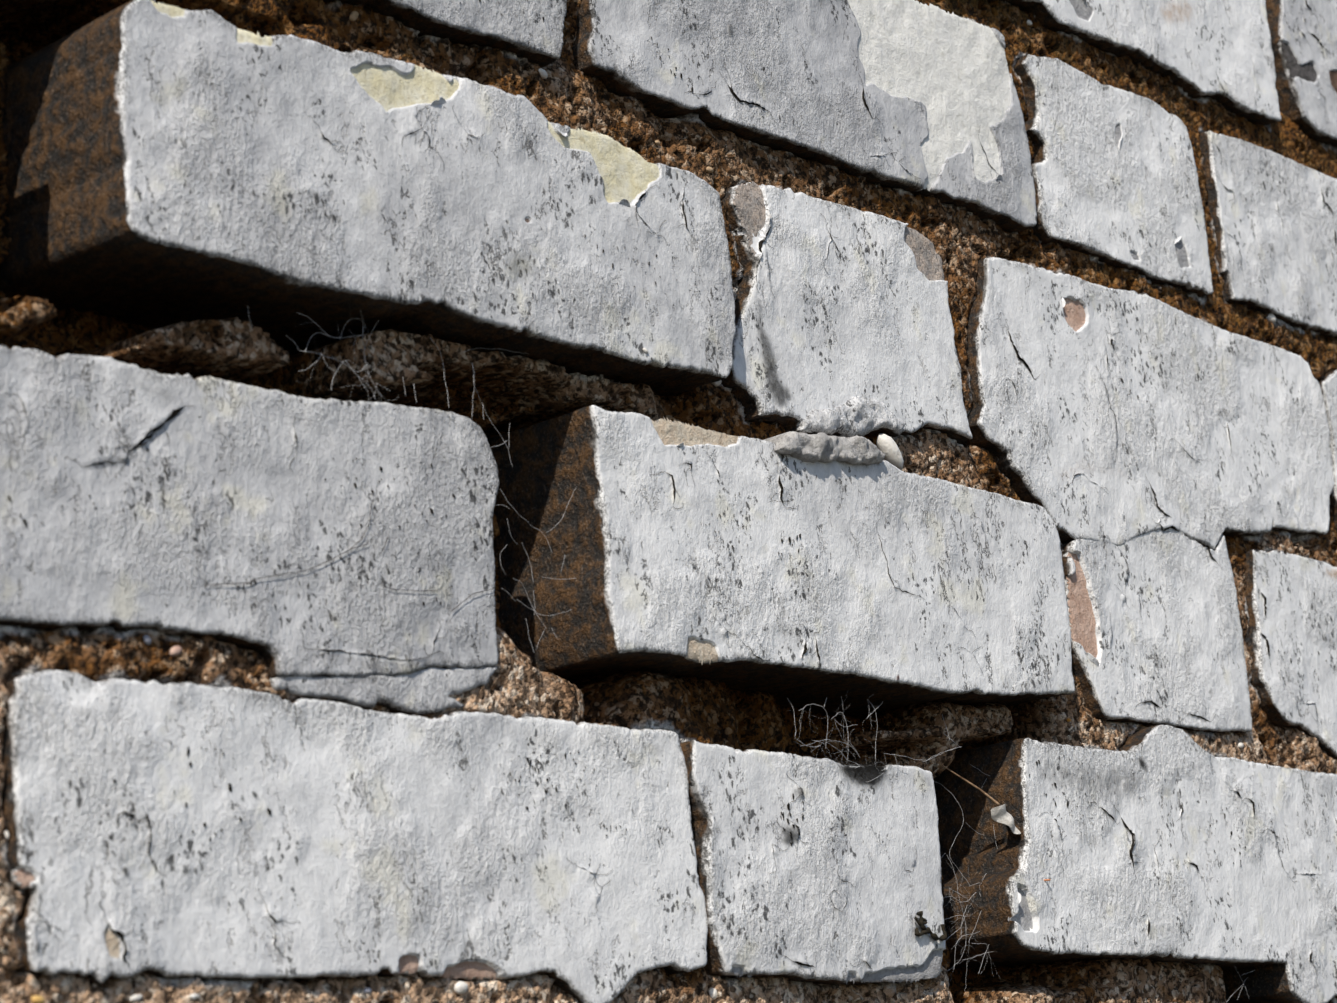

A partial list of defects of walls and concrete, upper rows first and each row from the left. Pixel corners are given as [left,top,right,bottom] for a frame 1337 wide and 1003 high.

peeling [1069,0,1093,21]
peeling [350,64,459,111]
peeling [848,0,1011,191]
peeling [548,121,660,206]
spalling [733,181,771,258]
crack [1005,319,1037,404]
crack [69,406,195,477]
crack [1065,324,1122,490]
crack [1146,477,1218,564]
spalling [1066,552,1099,666]
crack [1091,793,1205,879]
crack [1231,783,1322,882]